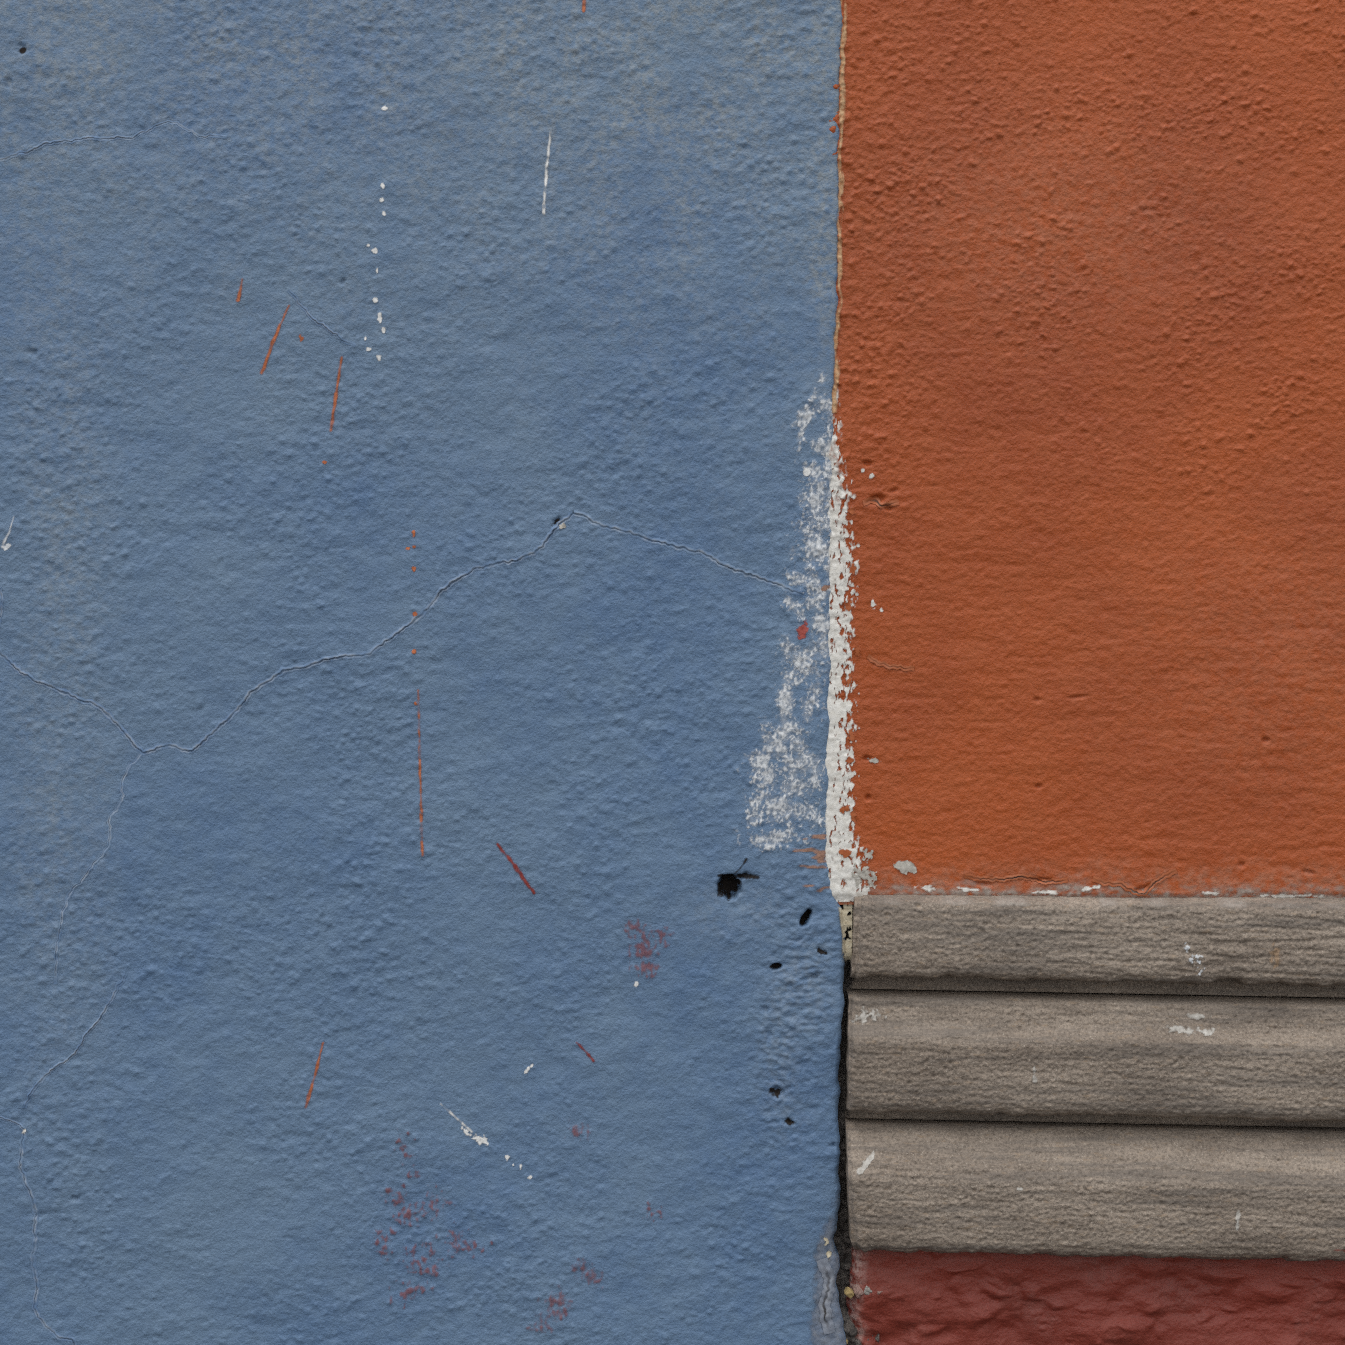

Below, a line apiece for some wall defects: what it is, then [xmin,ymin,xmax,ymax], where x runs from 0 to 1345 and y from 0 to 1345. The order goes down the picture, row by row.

crack [0,120,227,162]
crack [0,510,806,985]
hole [718,858,759,901]
crack [0,973,128,1345]